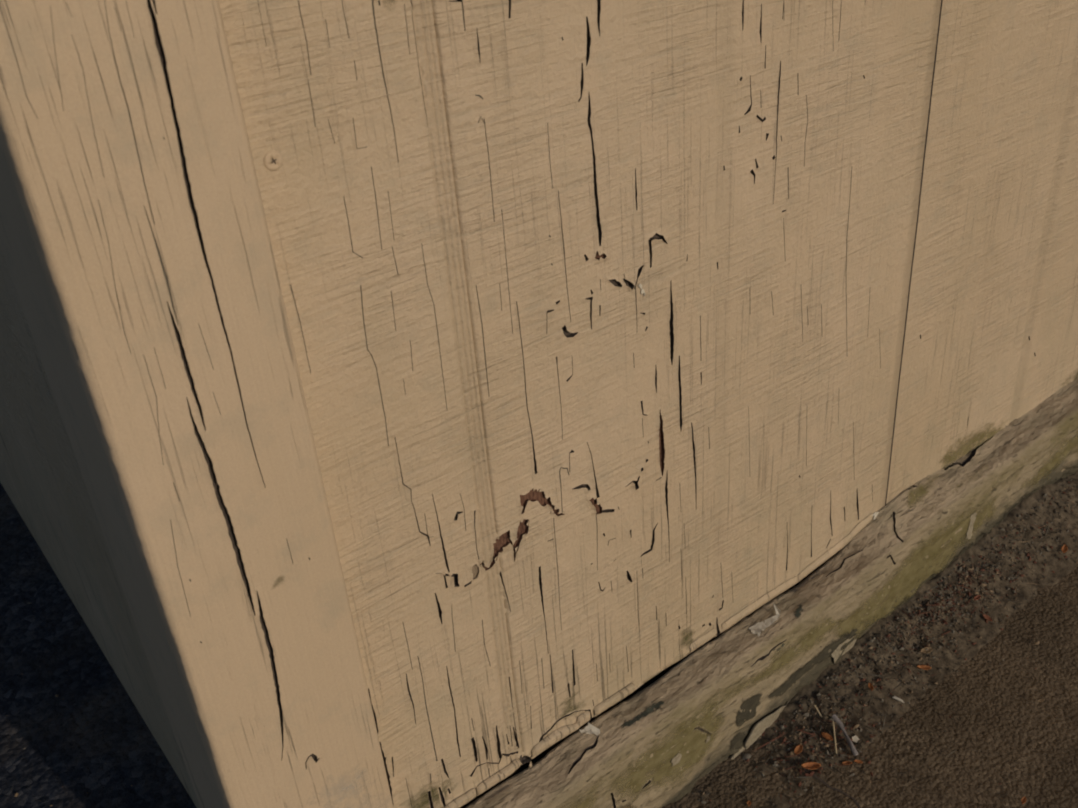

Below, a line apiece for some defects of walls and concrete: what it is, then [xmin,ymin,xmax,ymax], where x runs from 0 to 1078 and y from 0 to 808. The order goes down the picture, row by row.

crack [578,0,602,246]
crack [742,0,808,249]
crack [298,0,434,546]
crack [50,0,283,756]
peeling [432,488,566,588]
peeling [573,443,619,548]
crack [633,283,710,574]
crack [786,490,904,577]
crack [944,436,994,471]
peeling [729,701,789,760]
leakage [730,629,857,750]
peeling [831,636,857,664]